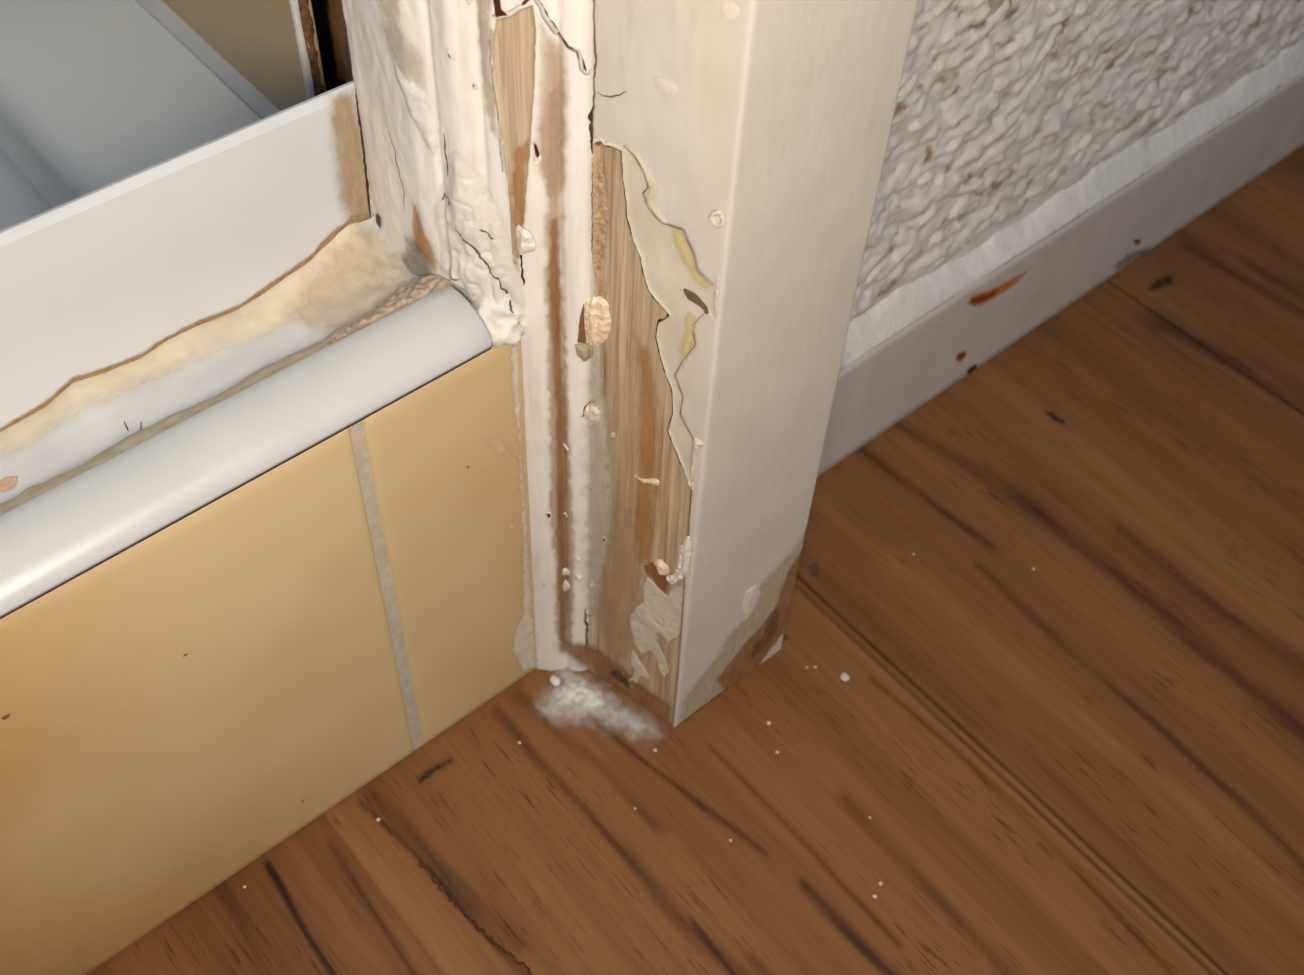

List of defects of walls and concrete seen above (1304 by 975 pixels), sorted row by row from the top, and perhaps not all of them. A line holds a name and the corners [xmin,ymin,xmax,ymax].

damp [0,0,434,451]
peeling [466,0,565,259]
crack [522,0,626,263]
peeling [562,137,720,724]
damp [546,92,805,724]
rust [970,274,1024,305]